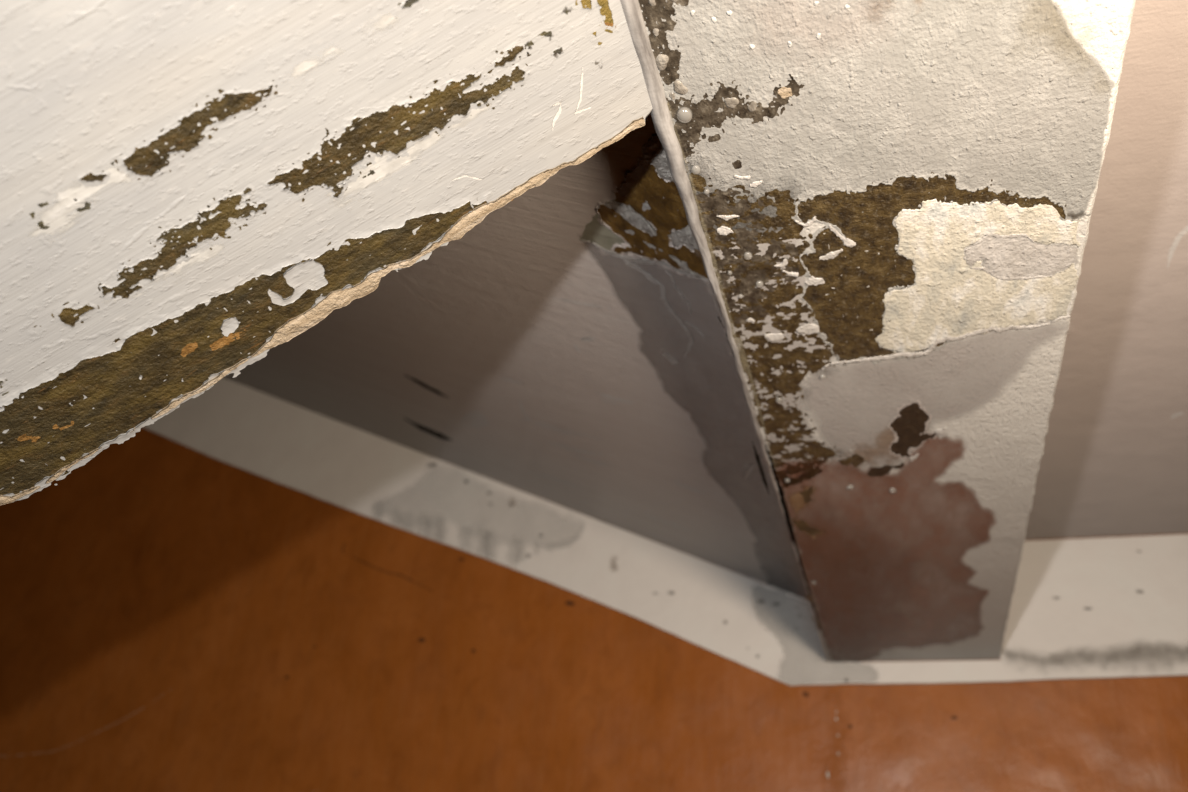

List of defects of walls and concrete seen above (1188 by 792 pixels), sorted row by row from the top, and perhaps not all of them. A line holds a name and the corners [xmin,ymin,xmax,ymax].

peeling [377,0,440,29]
peeling [565,0,619,45]
peeling [29,31,552,330]
peeling [0,116,710,505]
damp [589,0,1114,672]
spalling [792,169,1082,370]